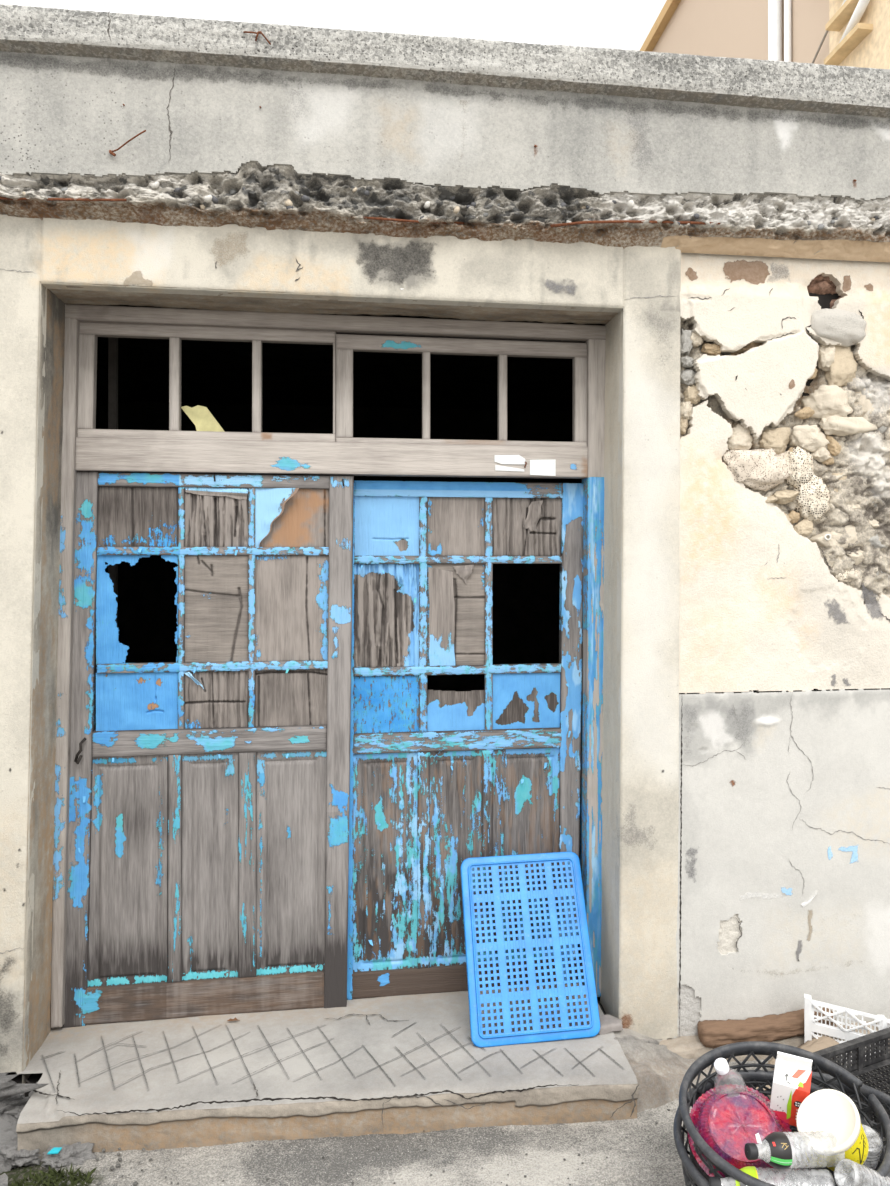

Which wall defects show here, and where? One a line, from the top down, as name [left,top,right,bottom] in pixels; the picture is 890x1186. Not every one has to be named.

crack [167,71,175,162]
spalling [0,161,890,262]
flaking render [680,274,890,604]
crack [786,701,886,843]
peeling [717,914,742,955]
crack [25,1070,576,1124]